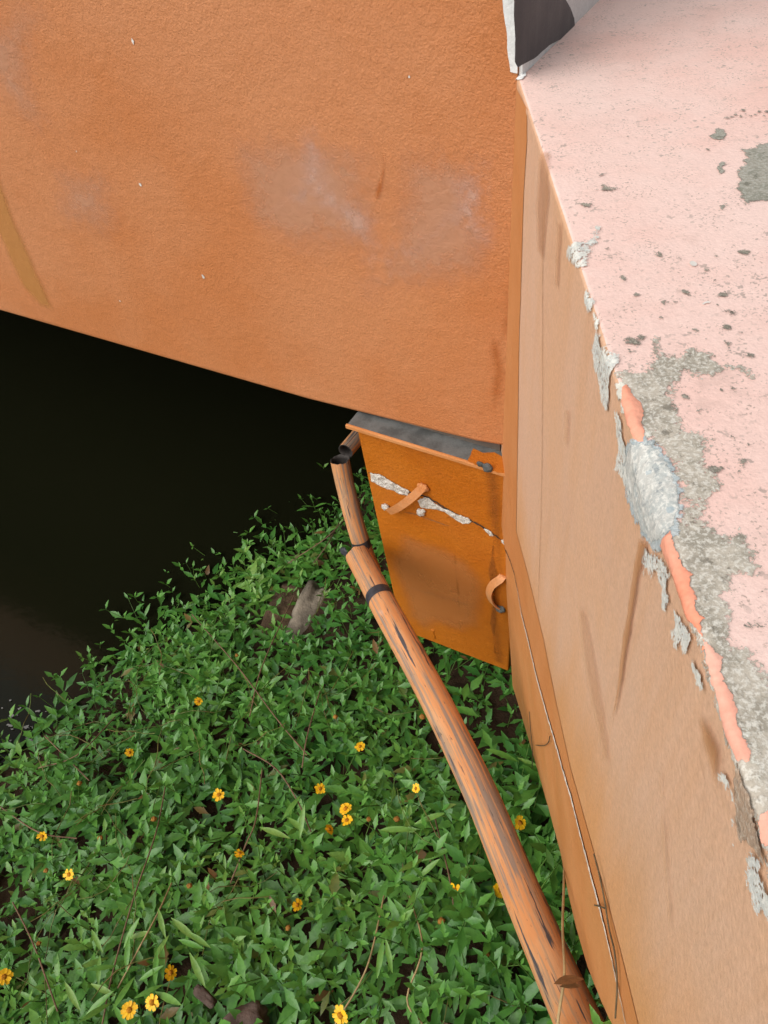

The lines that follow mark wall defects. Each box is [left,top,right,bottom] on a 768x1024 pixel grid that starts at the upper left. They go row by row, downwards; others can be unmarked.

peeling [706,109,768,150]
peeling [717,143,768,205]
peeling [566,226,609,268]
peeling [584,268,768,921]